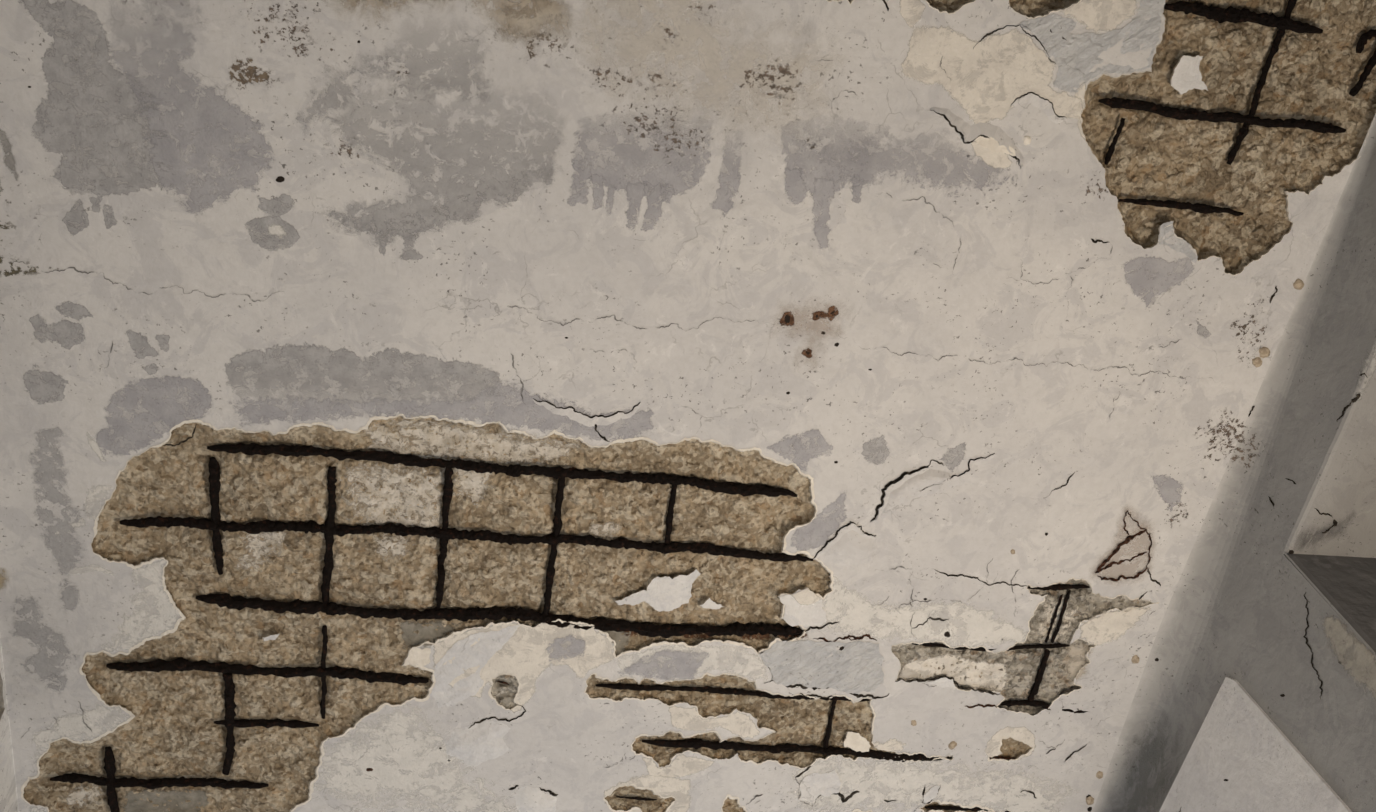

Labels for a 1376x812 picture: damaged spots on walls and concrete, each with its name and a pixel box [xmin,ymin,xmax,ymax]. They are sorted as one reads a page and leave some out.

leakage [229,0,334,89]
leakage [479,0,573,66]
leakage [782,137,874,249]
spalling [823,0,1376,305]
leakage [0,223,51,277]
crack [511,354,641,442]
crack [813,453,995,559]
spalling [14,330,1159,812]
crack [1095,510,1161,612]
crack [1303,592,1323,699]